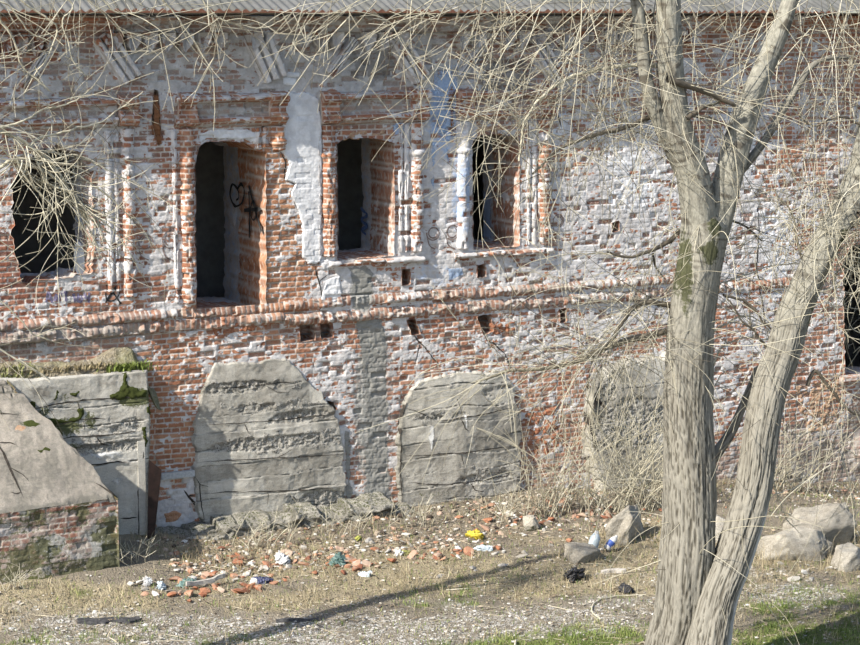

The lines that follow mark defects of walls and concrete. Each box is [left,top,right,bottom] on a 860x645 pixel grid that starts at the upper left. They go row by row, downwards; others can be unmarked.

peeling [199,129,256,144]
peeling [281,63,342,302]
peeling [601,130,667,213]
spalling [213,310,272,336]
spalling [489,320,515,335]
crack [0,442,30,496]